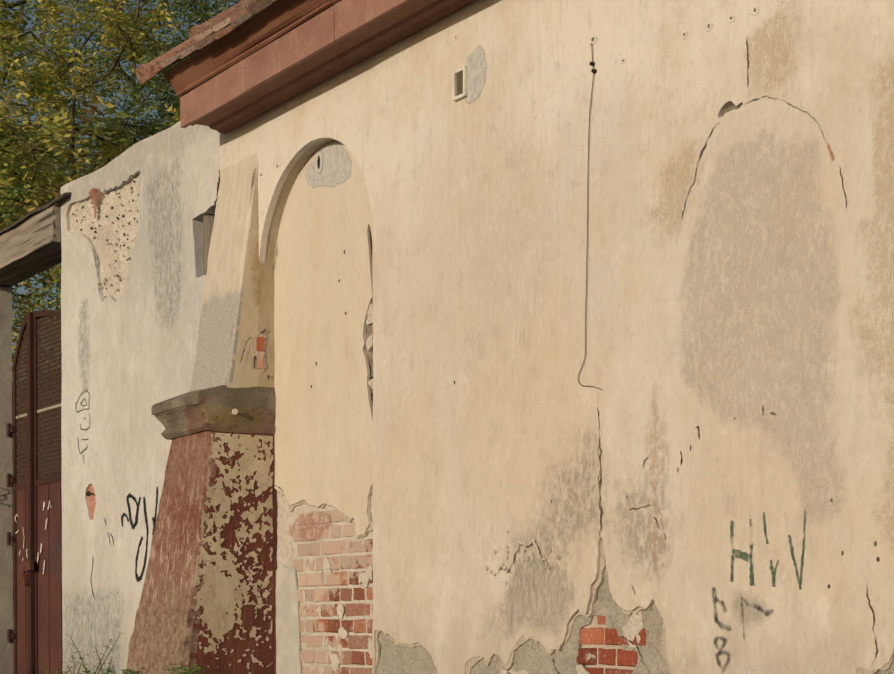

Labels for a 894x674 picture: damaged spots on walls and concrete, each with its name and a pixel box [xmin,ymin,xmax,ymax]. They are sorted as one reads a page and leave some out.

crack [745,40,826,141]
spalling [69,174,140,300]
crack [676,123,719,244]
flaking render [240,329,270,380]
spalling [365,303,373,406]
flaking render [86,484,96,519]
flaking render [192,433,438,674]
spalling [466,539,673,674]
crack [596,404,604,536]